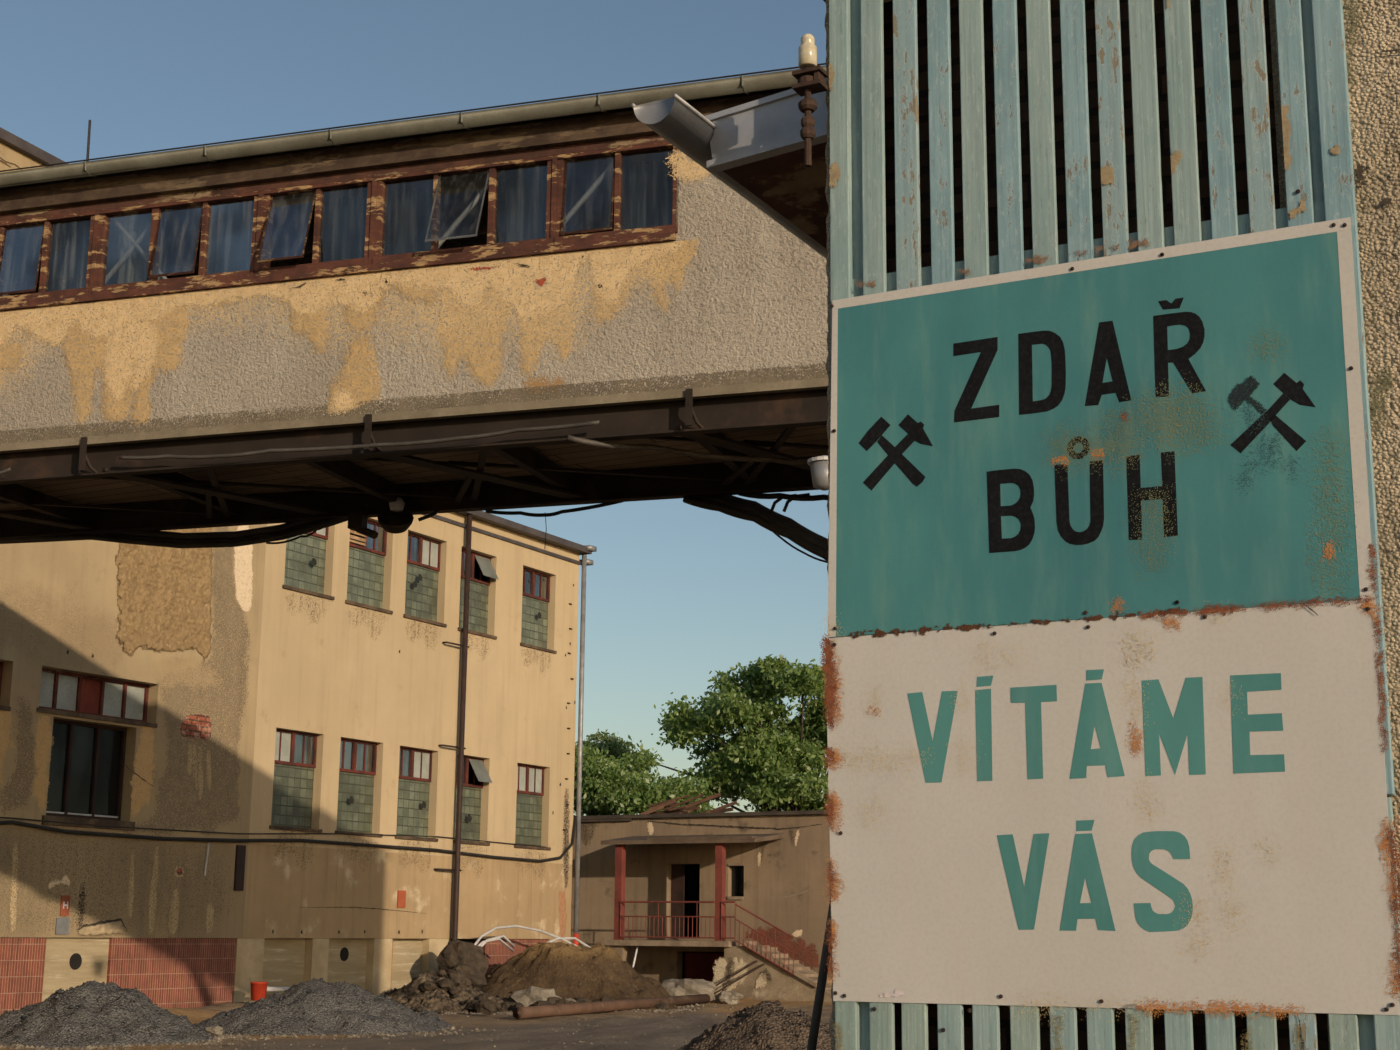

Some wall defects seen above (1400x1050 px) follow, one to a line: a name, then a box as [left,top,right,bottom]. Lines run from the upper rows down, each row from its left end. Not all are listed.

peeling [1101,166,1114,186]
peeling [1171,149,1183,175]
peeling [1281,104,1292,171]
peeling [0,239,700,428]
flaking render [115,527,215,661]
flaking render [177,713,213,799]